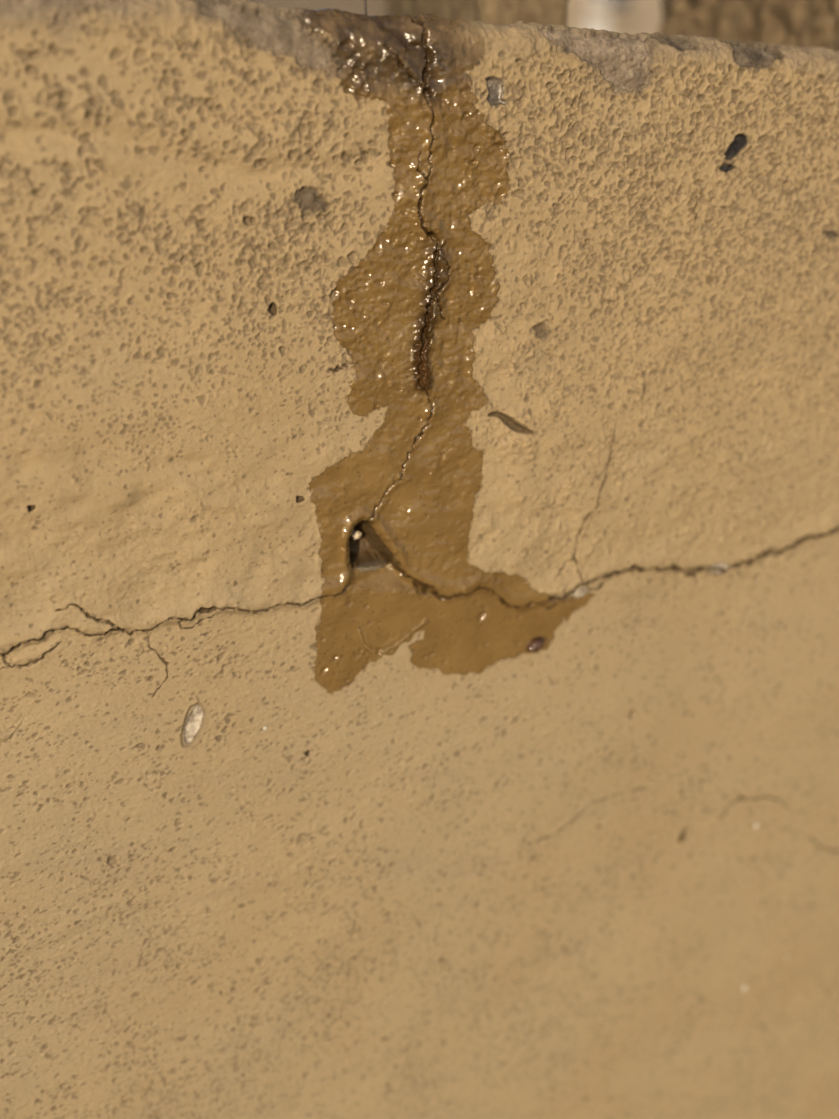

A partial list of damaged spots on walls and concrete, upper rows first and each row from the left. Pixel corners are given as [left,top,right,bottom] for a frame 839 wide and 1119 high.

crack [384,20,451,344]
leakage [295,7,595,694]
crack [364,389,433,522]
crack [380,430,839,610]
crack [1,583,350,697]